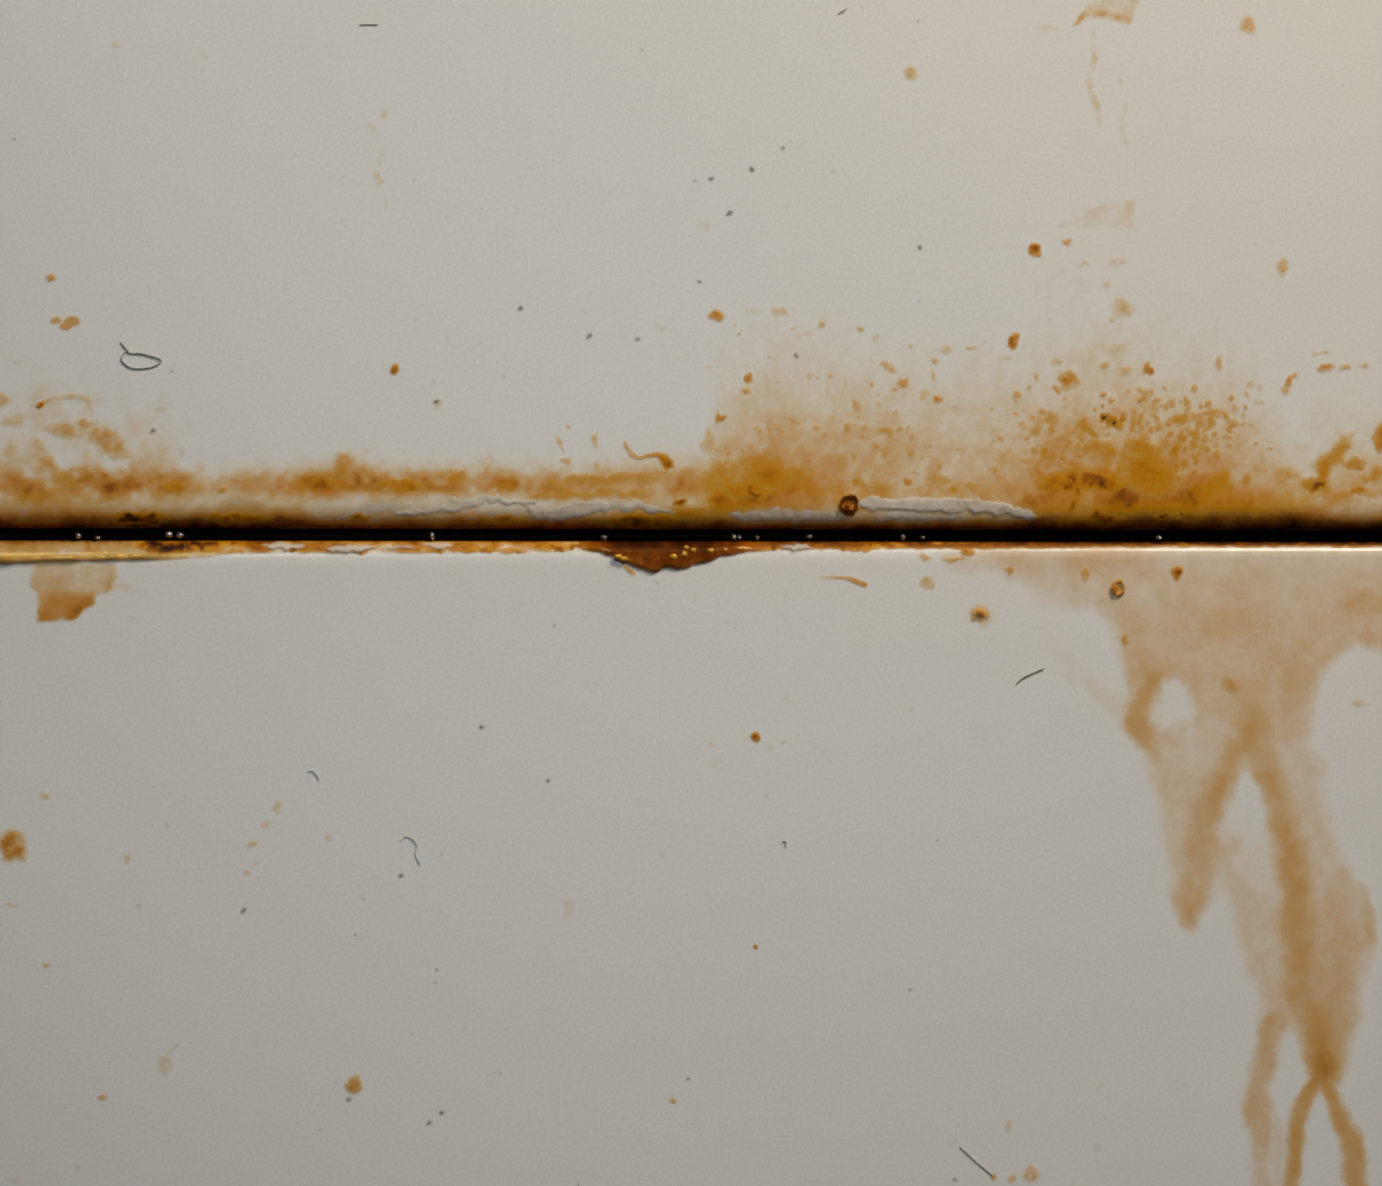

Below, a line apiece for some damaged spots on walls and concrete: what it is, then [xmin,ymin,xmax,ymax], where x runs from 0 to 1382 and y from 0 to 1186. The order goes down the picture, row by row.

corrosion [52,317,79,329]
corrosion [1008,333,1020,349]
corrosion [0,363,1382,574]
corrosion [1172,566,1183,580]
corrosion [1110,579,1125,596]
corrosion [38,585,95,621]
corrosion [0,832,24,860]